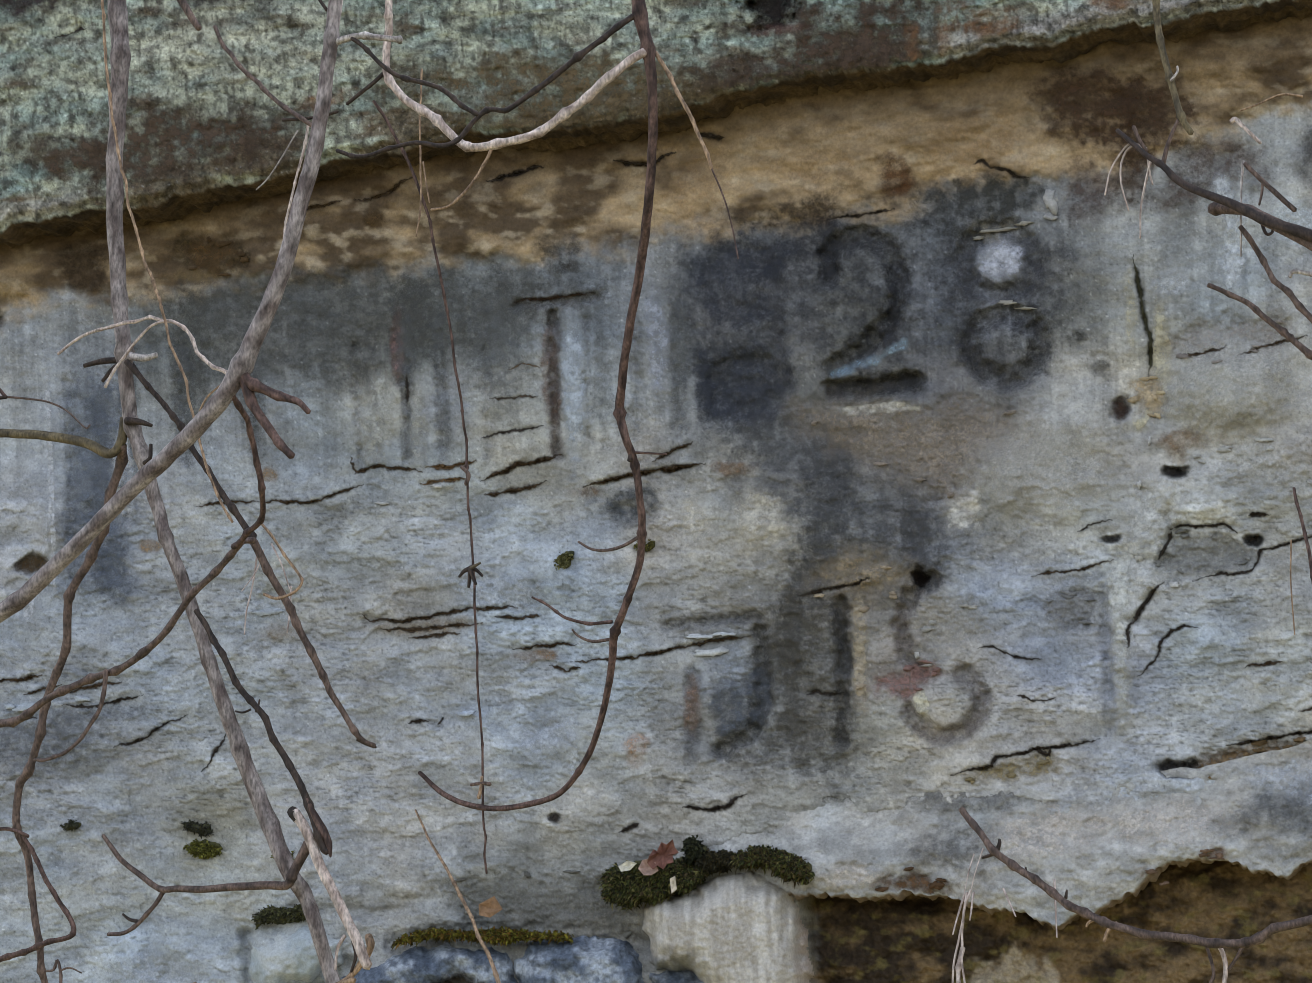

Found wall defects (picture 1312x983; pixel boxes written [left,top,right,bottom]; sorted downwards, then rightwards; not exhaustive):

crack [1126,512,1312,677]
crack [950,738,1100,776]